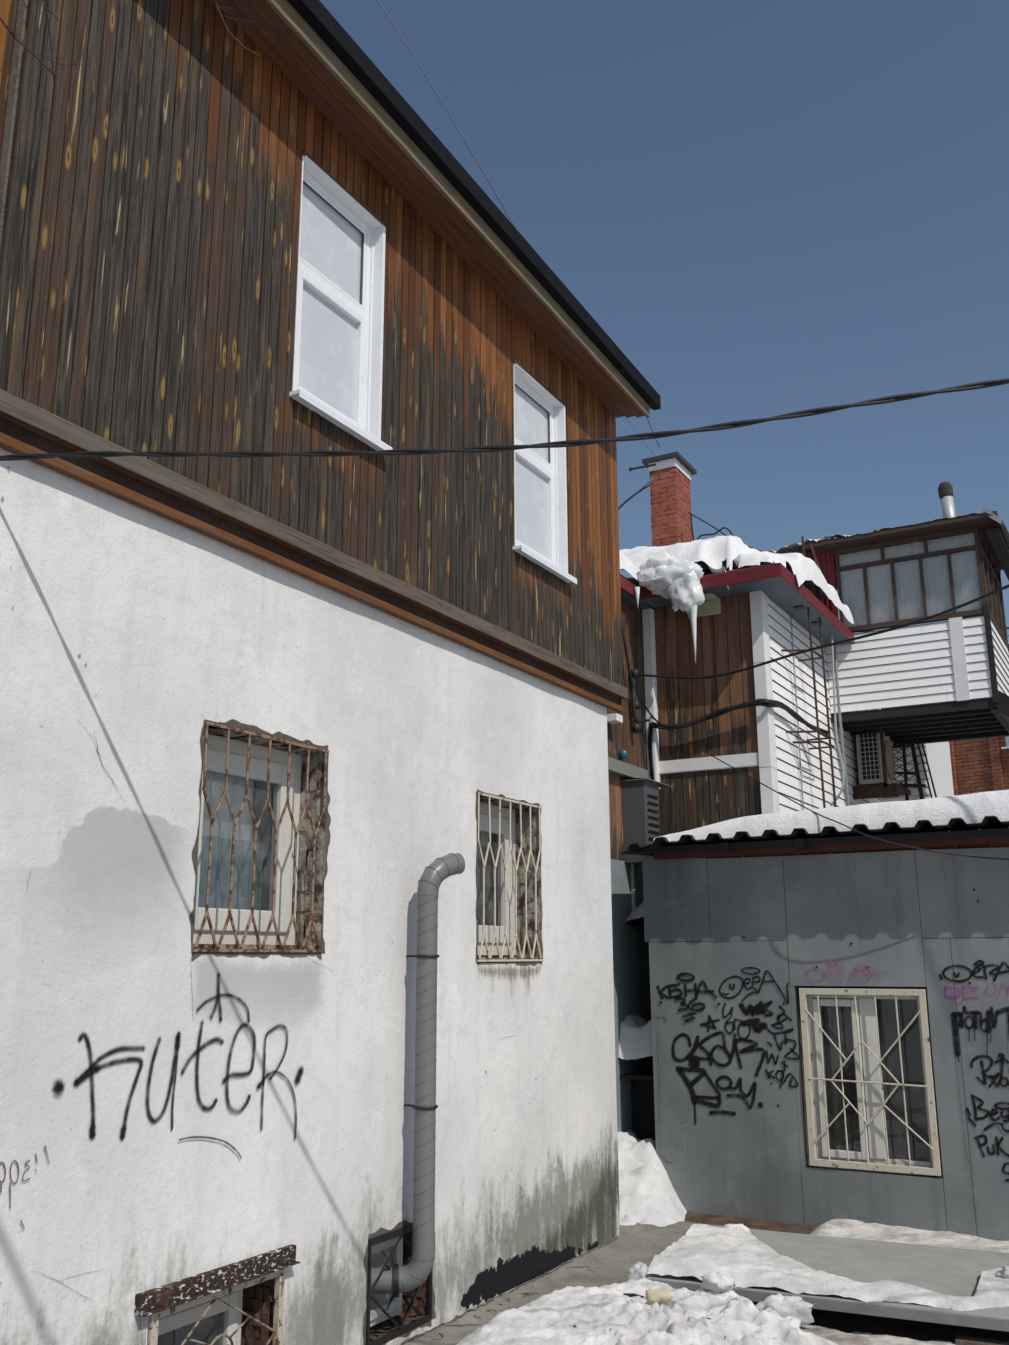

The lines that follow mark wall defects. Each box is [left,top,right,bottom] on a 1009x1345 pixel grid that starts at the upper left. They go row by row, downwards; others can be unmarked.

damp [432,1140,619,1323]
damp [288,1258,367,1345]
spalling [459,1241,598,1310]